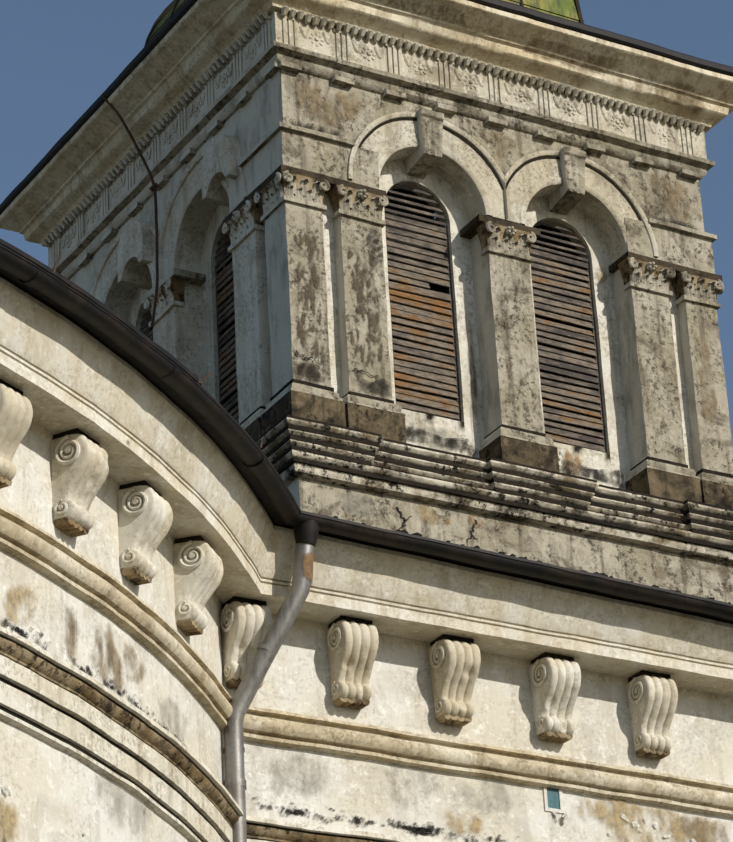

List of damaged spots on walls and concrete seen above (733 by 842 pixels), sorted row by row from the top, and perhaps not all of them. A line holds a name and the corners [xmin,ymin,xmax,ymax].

leakage [529,42,609,71]
corrosion [303,553,314,584]
leakage [0,801,17,842]
leakage [252,797,342,823]
leakage [354,814,505,842]